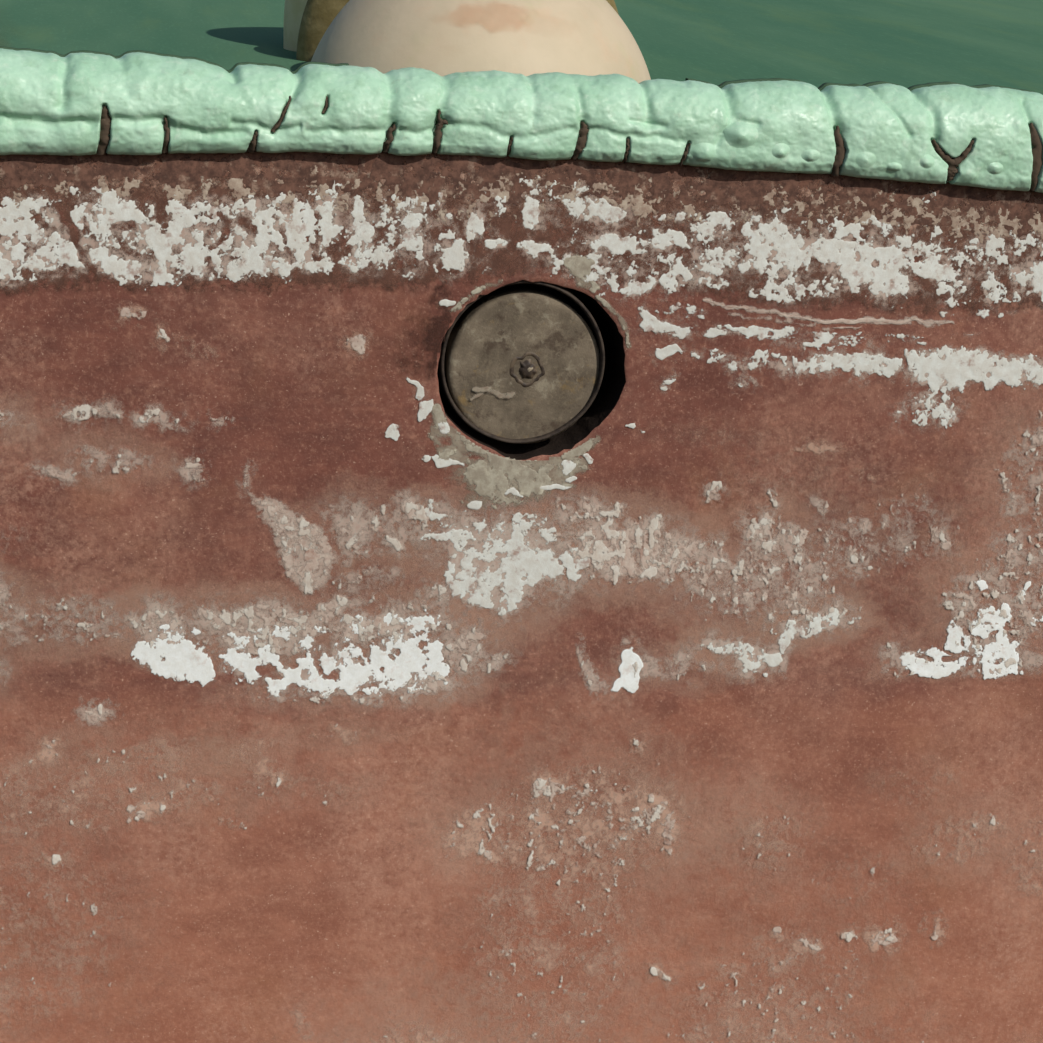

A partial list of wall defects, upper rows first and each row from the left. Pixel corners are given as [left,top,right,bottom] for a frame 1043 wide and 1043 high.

crack [96,106,111,155]
crack [247,96,292,153]
crack [572,122,589,160]
crack [832,126,846,176]
crack [931,139,974,181]
crack [1029,123,1043,191]
peeling [0,152,1043,429]
peeling [385,424,400,441]
spalling [407,377,601,510]
peeling [131,609,450,698]
peeling [611,647,643,693]
peeling [899,603,1023,680]